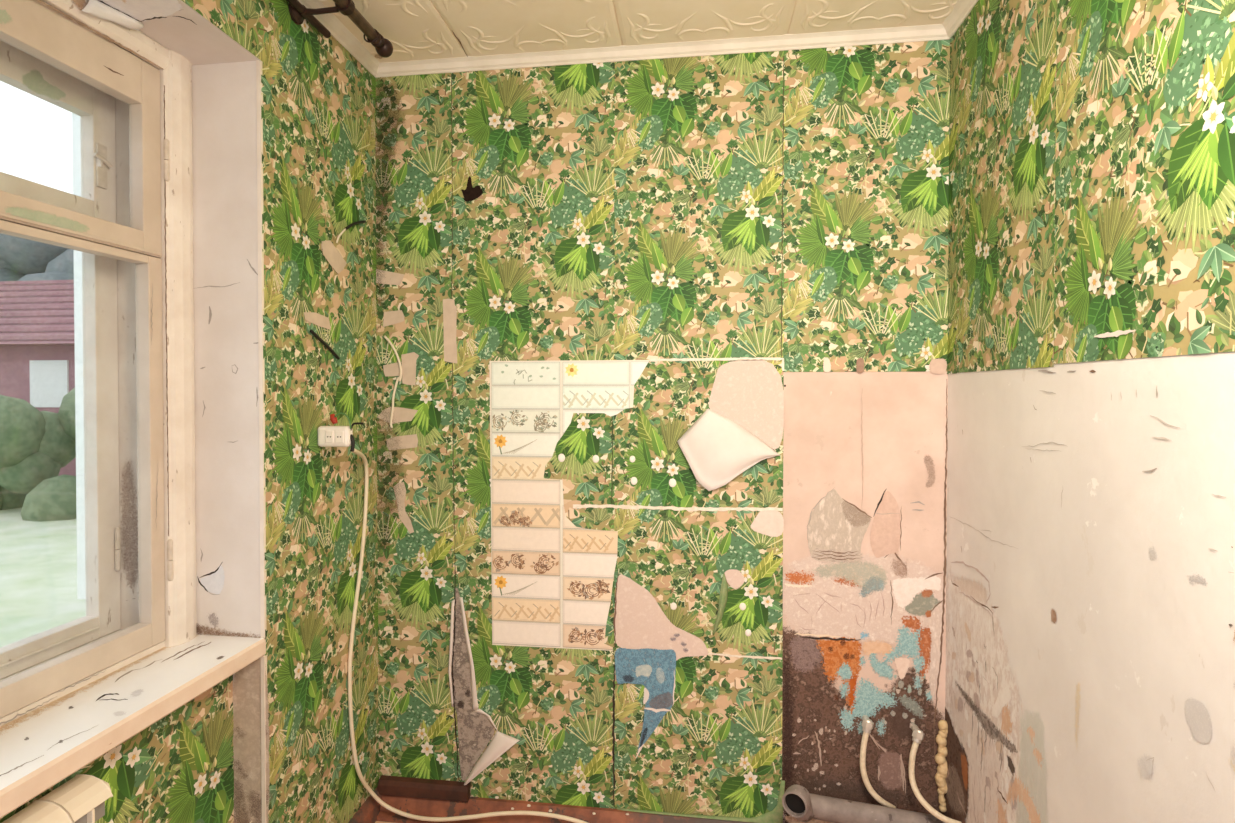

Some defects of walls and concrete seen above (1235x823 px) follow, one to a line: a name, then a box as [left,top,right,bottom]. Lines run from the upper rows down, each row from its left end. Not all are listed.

hole [461,176,483,202]
peeling [197,563,225,595]
flaking render [835,553,1043,823]